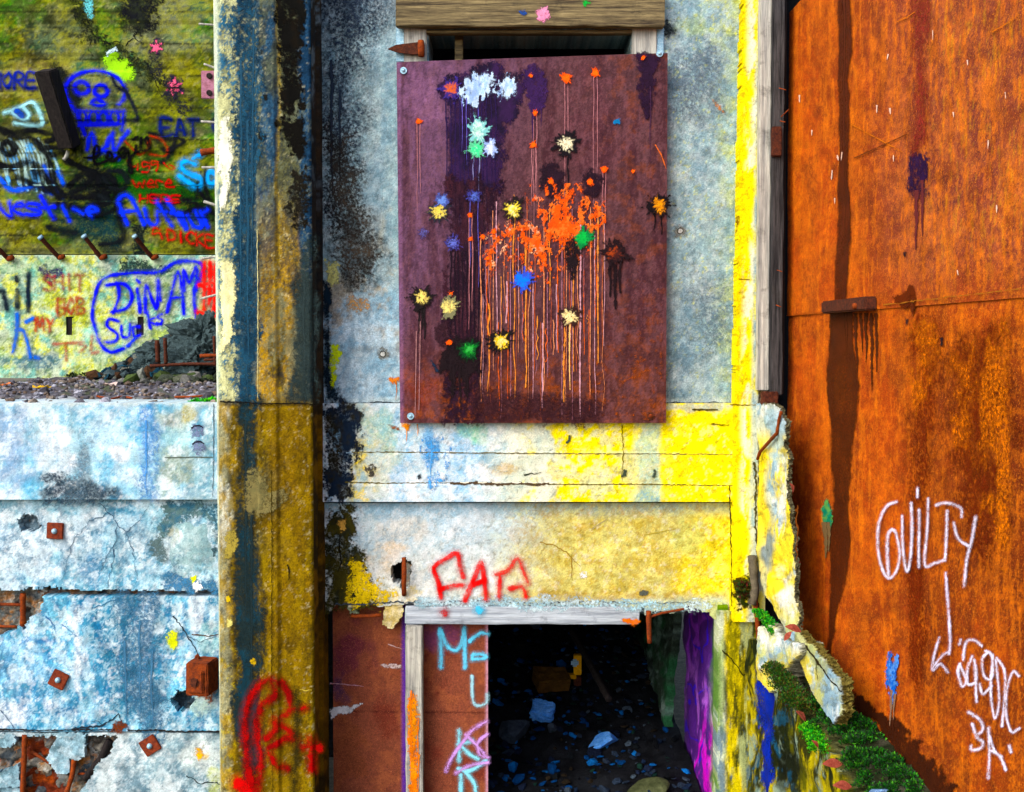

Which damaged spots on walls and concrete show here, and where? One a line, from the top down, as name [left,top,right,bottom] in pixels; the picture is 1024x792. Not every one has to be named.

corrosion [907,0,931,250]
damp [99,0,394,783]
spalling [21,514,41,531]
crack [61,503,146,608]
corrosion [894,285,1021,691]
spalling [0,586,50,635]
spalling [173,690,196,708]
corrosion [333,604,488,792]
spalling [0,731,117,792]